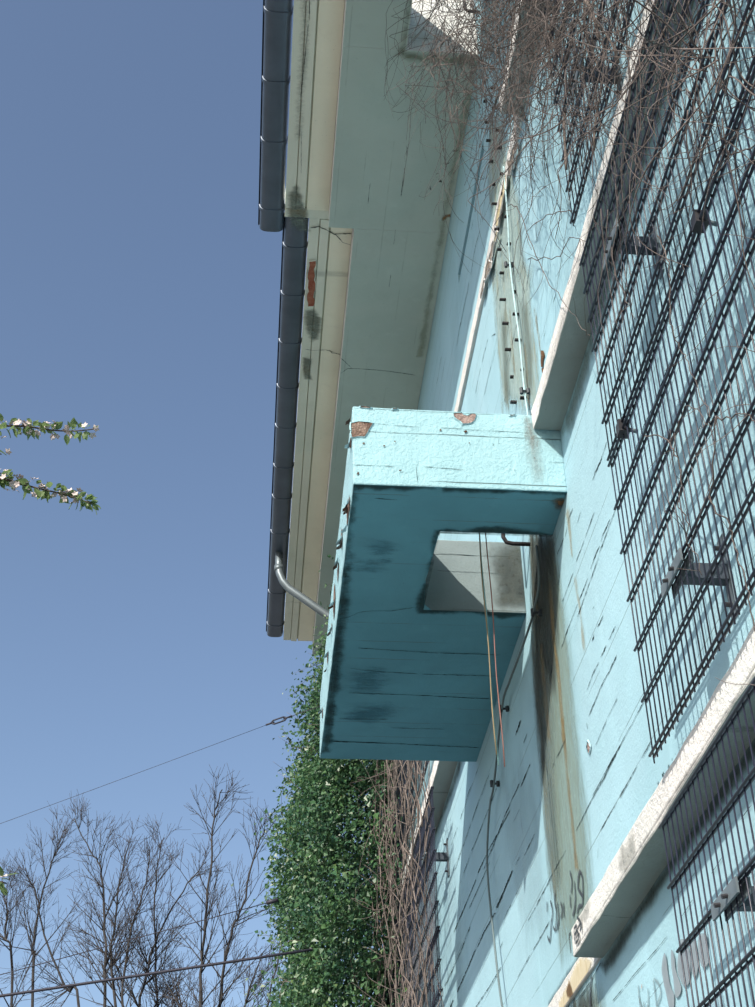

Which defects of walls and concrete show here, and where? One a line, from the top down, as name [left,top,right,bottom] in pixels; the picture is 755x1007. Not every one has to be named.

mould [289,186,309,231]
damp [489,123,538,407]
damp [417,527,600,946]
damp [566,971,601,1007]